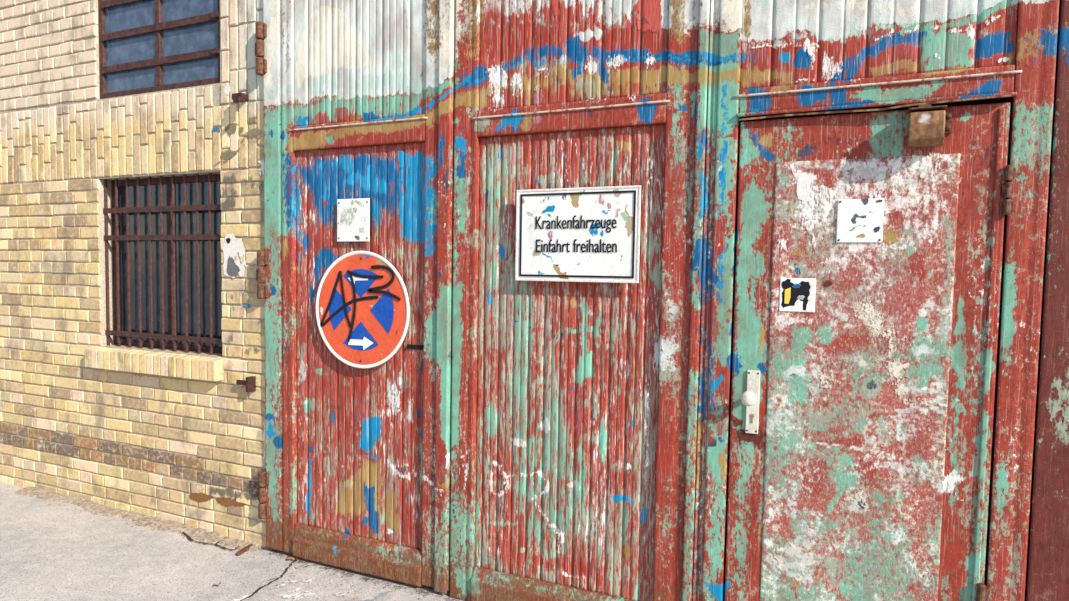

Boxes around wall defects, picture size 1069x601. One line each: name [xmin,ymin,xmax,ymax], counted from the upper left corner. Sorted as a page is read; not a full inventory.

peeling [633,0,661,33]
peeling [485,62,523,111]
peeling [585,55,630,73]
peeling [796,42,845,82]
peeling [842,153,944,199]
peeling [790,163,833,248]
peeling [851,297,947,407]
peeling [489,463,561,553]
peeling [847,492,870,514]
peeling [942,474,963,501]
crack [240,556,297,601]
peeling [769,554,811,585]